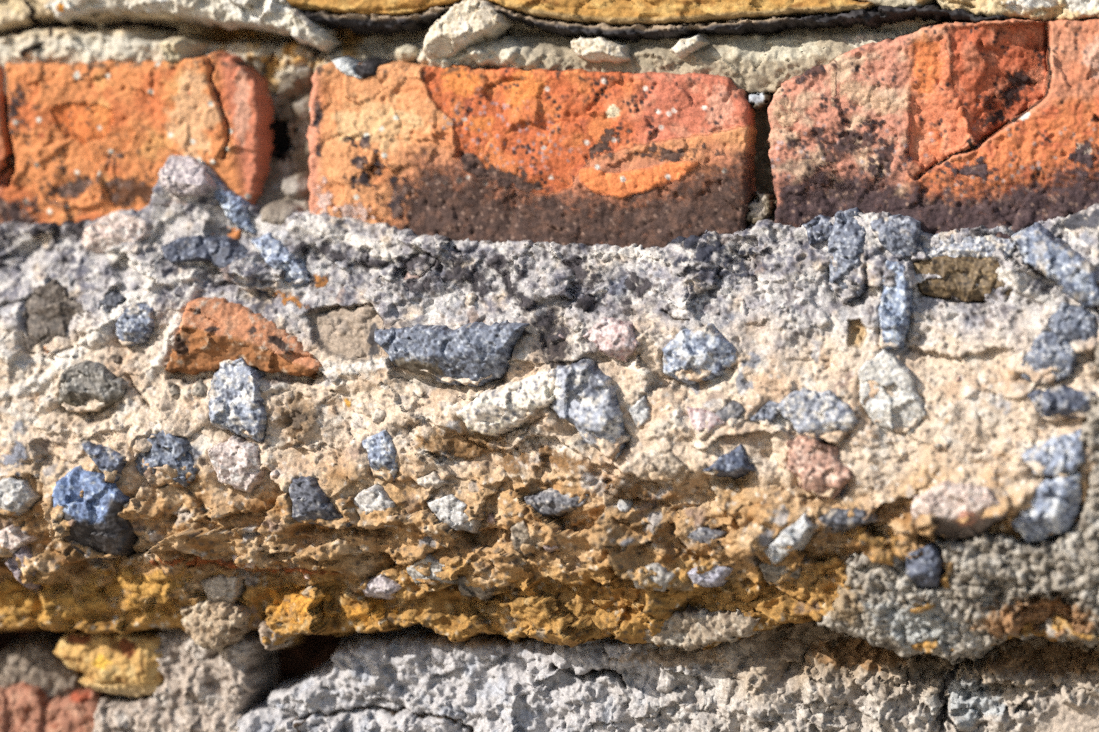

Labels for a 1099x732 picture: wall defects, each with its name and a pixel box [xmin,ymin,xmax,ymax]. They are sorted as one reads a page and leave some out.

crack [1012,47,1052,122]
crack [937,138,978,164]
spalling [306,304,384,361]
spalling [849,320,866,347]
crack [937,664,960,732]